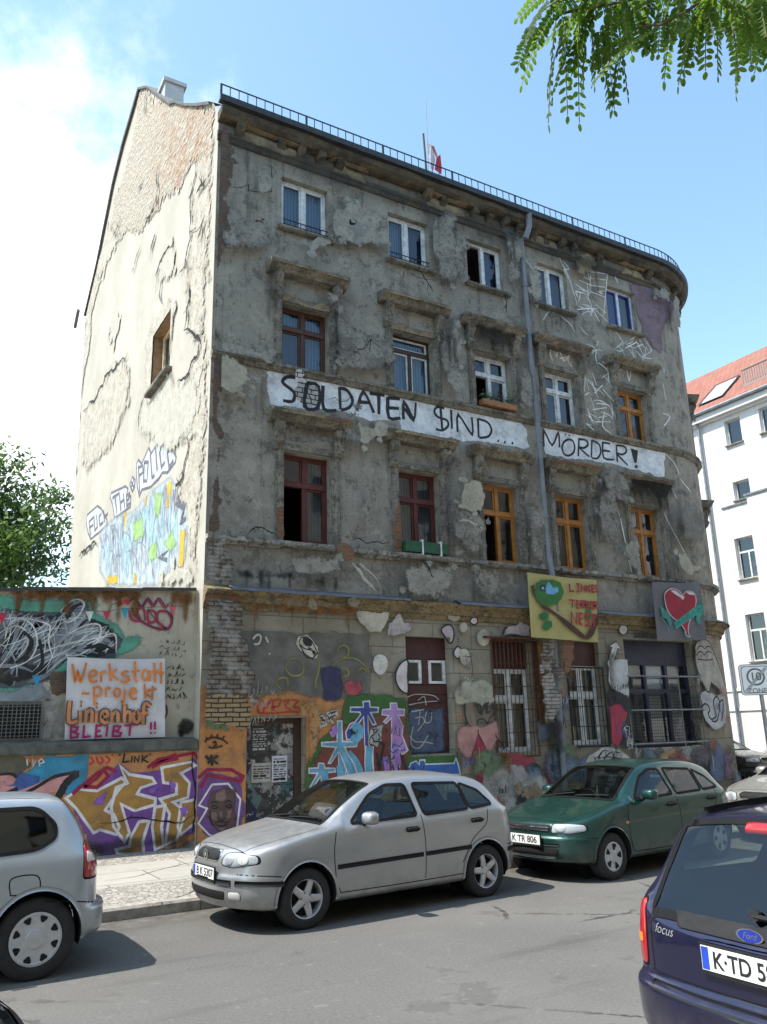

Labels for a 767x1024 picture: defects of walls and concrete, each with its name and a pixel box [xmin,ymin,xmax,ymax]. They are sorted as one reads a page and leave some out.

crack [114,160,206,383]
crack [83,330,128,412]
spalling [75,88,303,731]
flaking render [279,369,457,451]
flaking render [399,476,501,600]
flaking render [540,638,574,723]